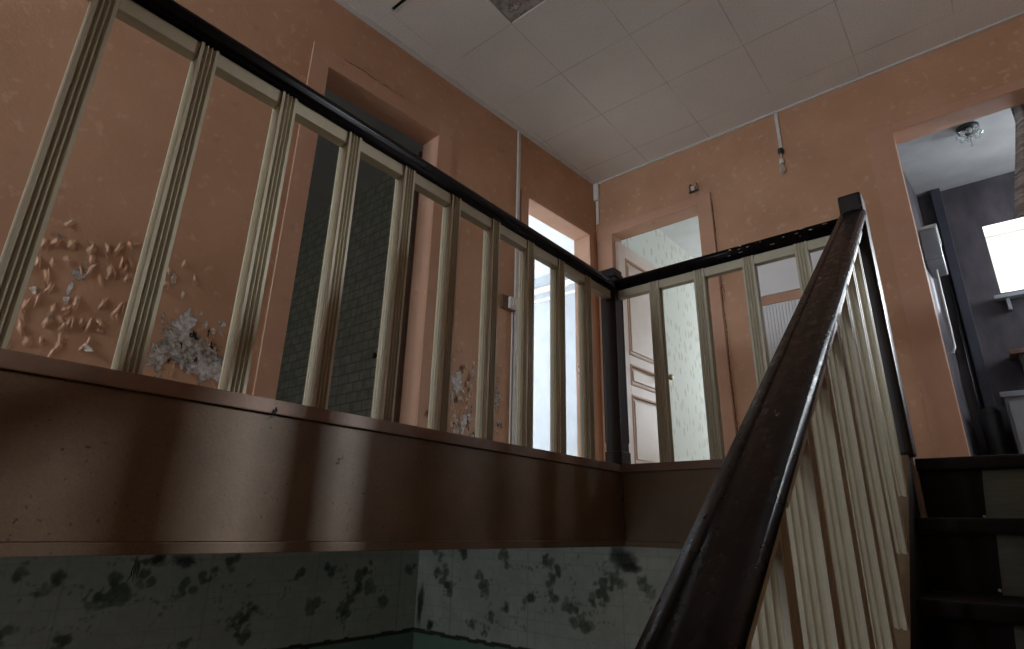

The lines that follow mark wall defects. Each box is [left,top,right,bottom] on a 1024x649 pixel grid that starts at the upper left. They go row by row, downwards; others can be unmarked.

spalling [145,294,226,388]
damp [611,549,638,573]